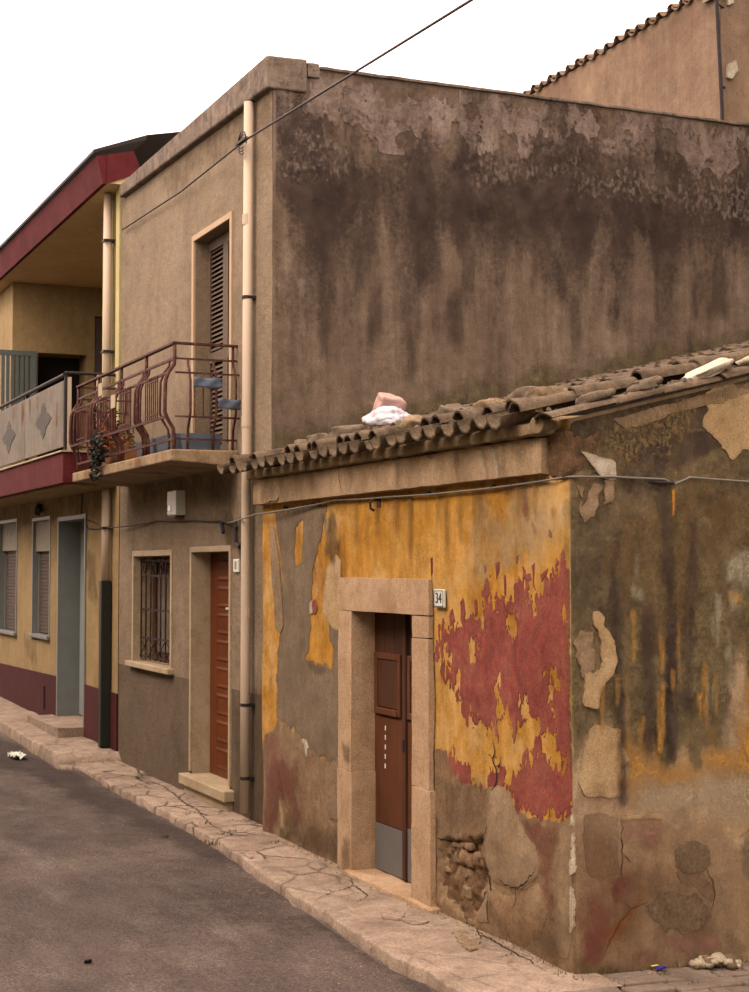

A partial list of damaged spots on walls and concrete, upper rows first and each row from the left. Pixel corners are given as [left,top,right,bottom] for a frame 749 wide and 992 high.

flaking render [276,77,749,182]
damp [276,96,749,315]
damp [405,333,749,415]
flaking render [614,356,749,460]
crack [121,771,248,841]
spalling [309,599,318,614]
crack [429,575,437,791]
crack [436,741,548,972]
peeling [433,549,662,972]
damp [570,389,749,814]